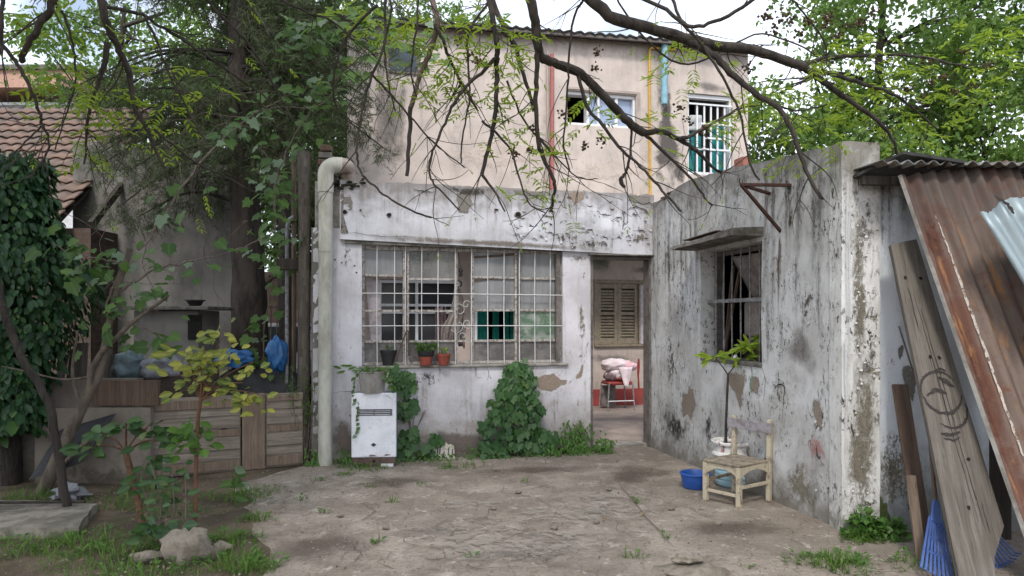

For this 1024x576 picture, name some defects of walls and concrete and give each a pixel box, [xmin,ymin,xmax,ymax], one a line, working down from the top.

spalling [340,193,353,233]
spalling [559,190,588,213]
spalling [628,193,650,205]
peeling [537,229,607,262]
peeling [537,361,584,394]
peeling [663,337,695,426]
peeling [723,366,762,415]
damp [665,413,685,438]
peeling [811,400,824,437]